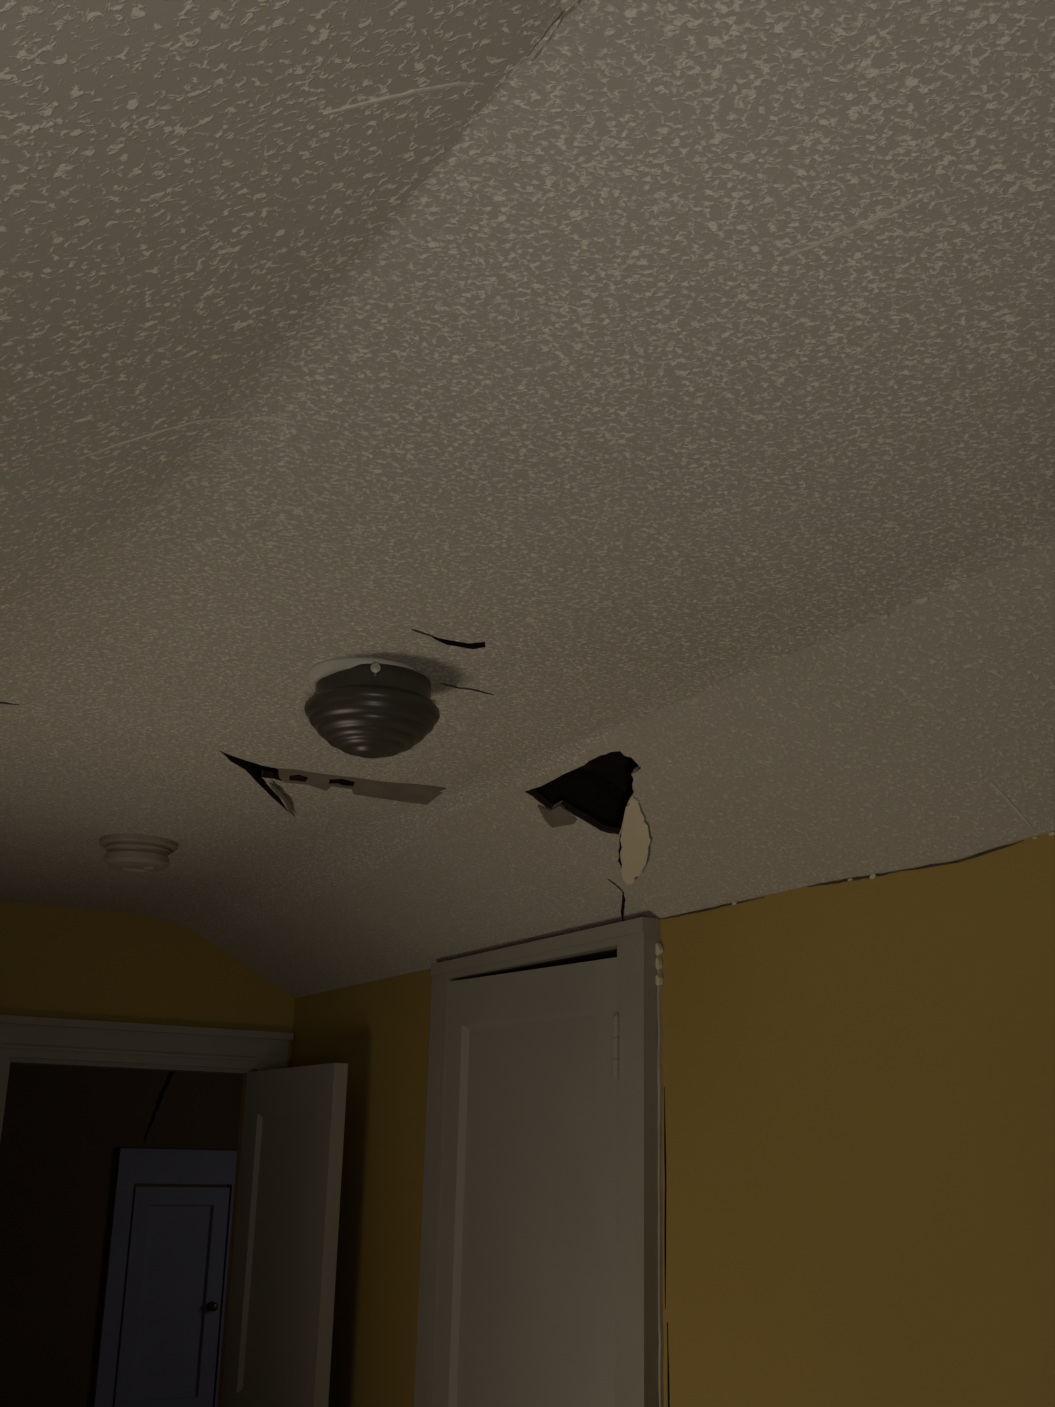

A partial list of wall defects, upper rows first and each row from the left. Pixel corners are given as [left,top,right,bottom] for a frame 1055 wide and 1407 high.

crack [411,629,486,649]
crack [440,683,493,695]
crack [220,751,447,816]
spalling [534,769,625,828]